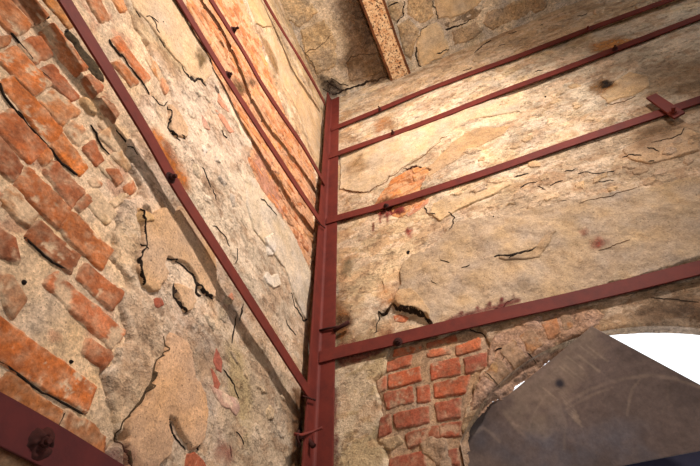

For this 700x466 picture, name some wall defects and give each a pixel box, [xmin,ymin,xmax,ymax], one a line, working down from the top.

crack [109,39,185,141]
crack [182,66,206,86]
crack [300,34,389,95]
crack [90,125,110,155]
crack [515,128,684,204]
flaking render [340,83,700,324]
crack [137,208,149,285]
crack [494,247,536,258]
crack [167,258,214,314]
crack [375,303,433,333]
crack [113,336,170,466]